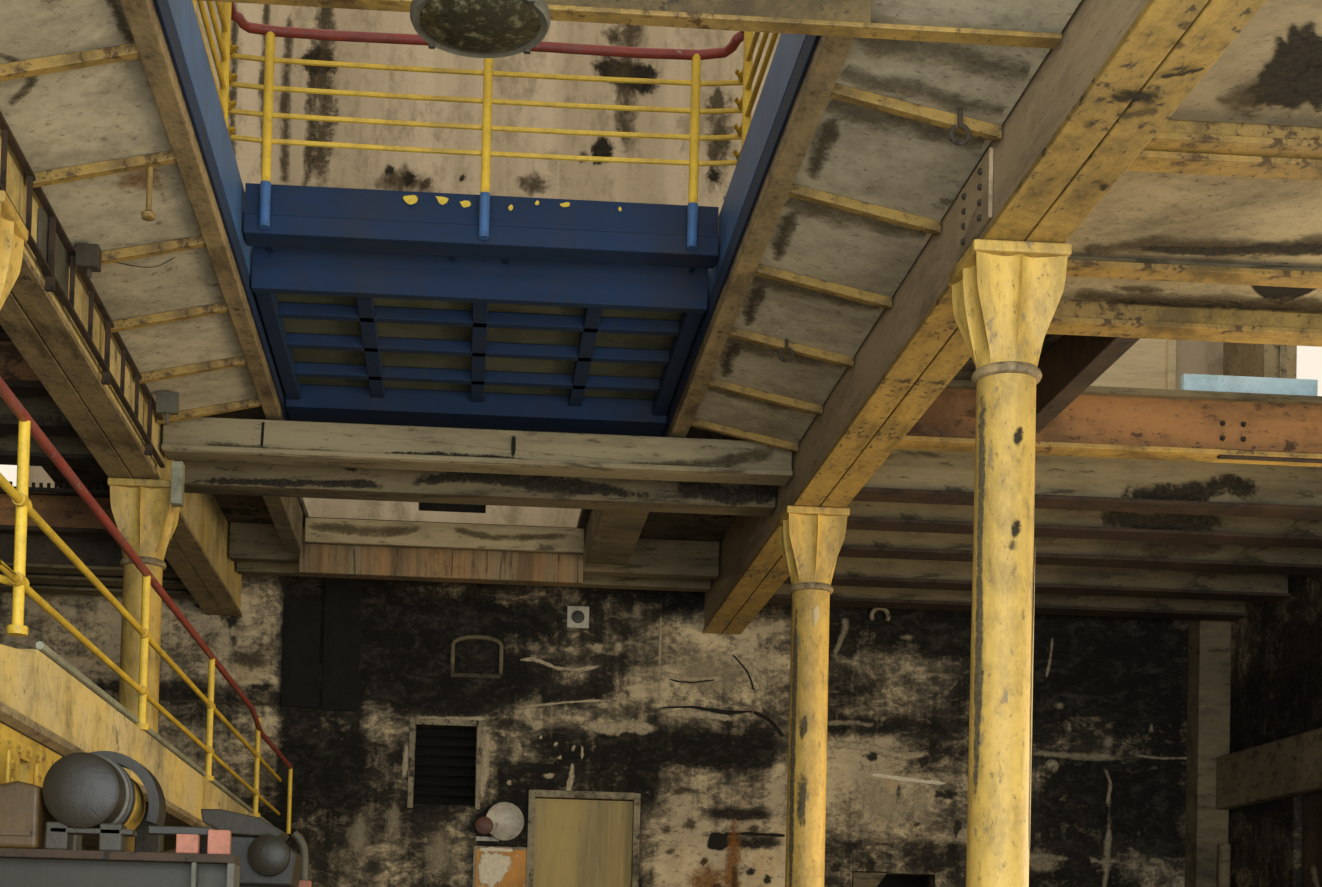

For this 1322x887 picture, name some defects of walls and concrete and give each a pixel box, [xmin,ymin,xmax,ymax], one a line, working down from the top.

damp [229,21,238,154]
damp [258,4,270,158]
damp [280,7,338,186]
damp [579,25,659,165]
damp [1218,22,1322,112]
damp [1032,737,1119,804]
rust [692,823,741,887]
damp [1029,853,1068,871]
damp [1090,825,1118,887]